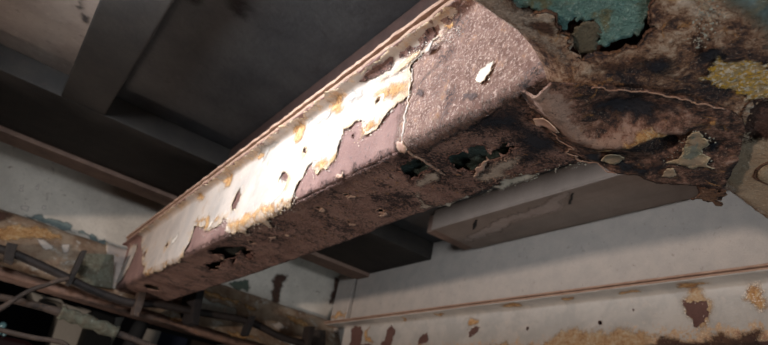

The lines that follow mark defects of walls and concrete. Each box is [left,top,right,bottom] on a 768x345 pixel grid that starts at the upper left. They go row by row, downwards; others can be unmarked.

rust [523,20,555,35]
rust [359,26,437,82]
rust [376,81,423,100]
peeling [115,7,464,288]
peeling [473,140,514,177]
rust [584,97,678,174]
peeling [662,130,716,178]
rust [0,212,62,241]
rust [271,274,287,303]
rust [329,277,339,304]
peeling [682,299,710,328]
peeling [349,324,395,345]